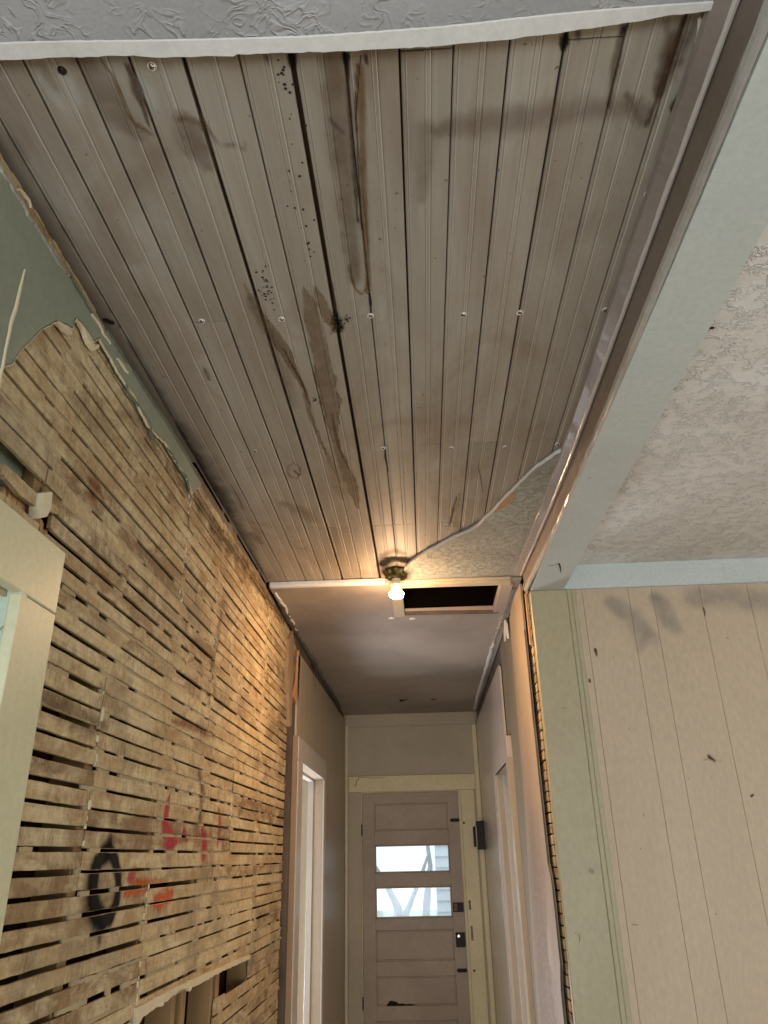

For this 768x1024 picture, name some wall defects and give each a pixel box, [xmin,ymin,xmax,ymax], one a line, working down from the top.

damp [340,52,370,294]
peeling [0,169,201,495]
damp [268,288,358,504]
spalling [129,955,250,1024]